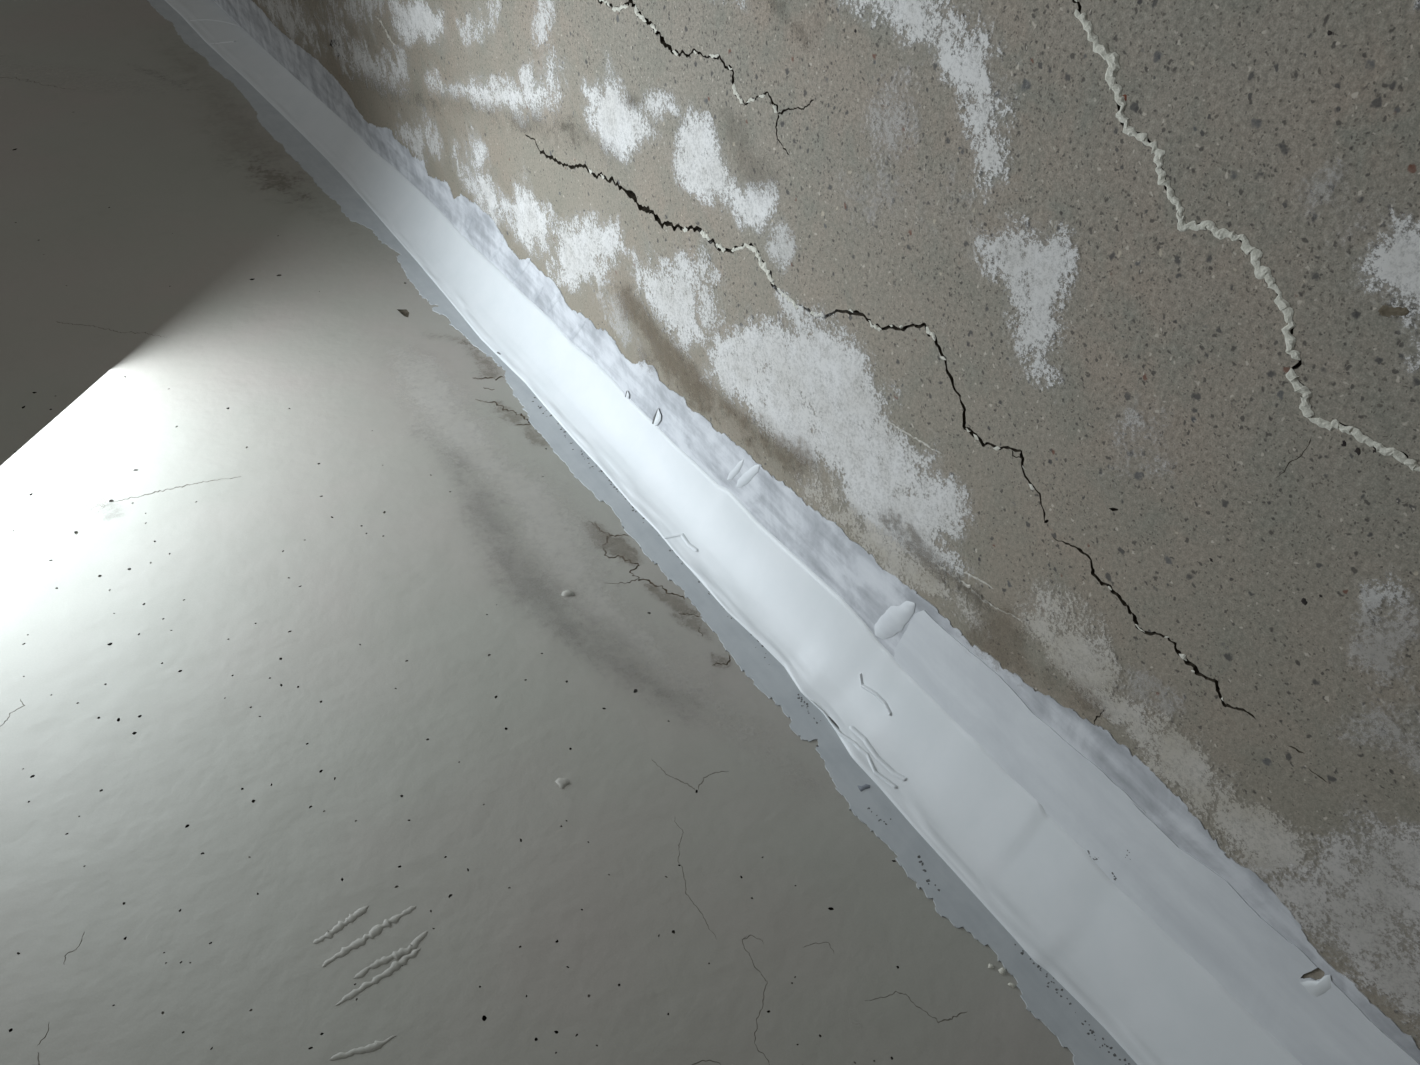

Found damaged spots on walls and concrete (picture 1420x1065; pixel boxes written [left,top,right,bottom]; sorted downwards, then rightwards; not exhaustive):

leakage [258,0,796,270]
leakage [395,104,990,668]
crack [598,0,814,155]
crack [525,134,1255,718]
leakage [833,0,1017,205]
leakage [973,207,1079,390]
crack [1072,0,1420,479]
leakage [1353,209,1420,372]